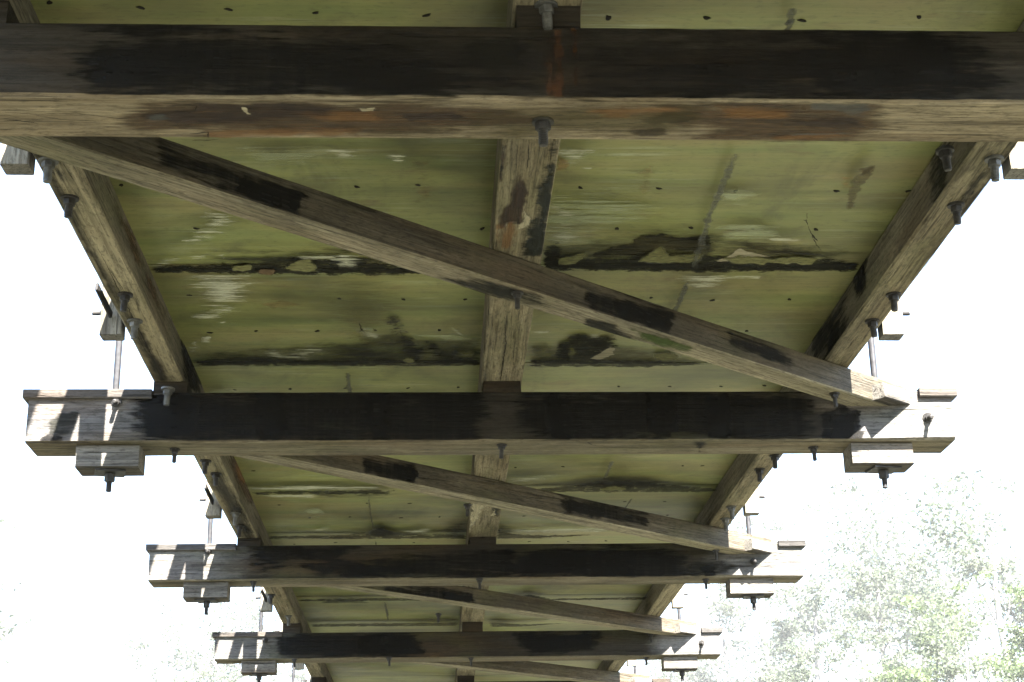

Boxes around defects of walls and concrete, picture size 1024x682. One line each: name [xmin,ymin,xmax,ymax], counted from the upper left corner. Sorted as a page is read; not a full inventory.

leakage [122,223,418,302]
leakage [497,148,868,368]